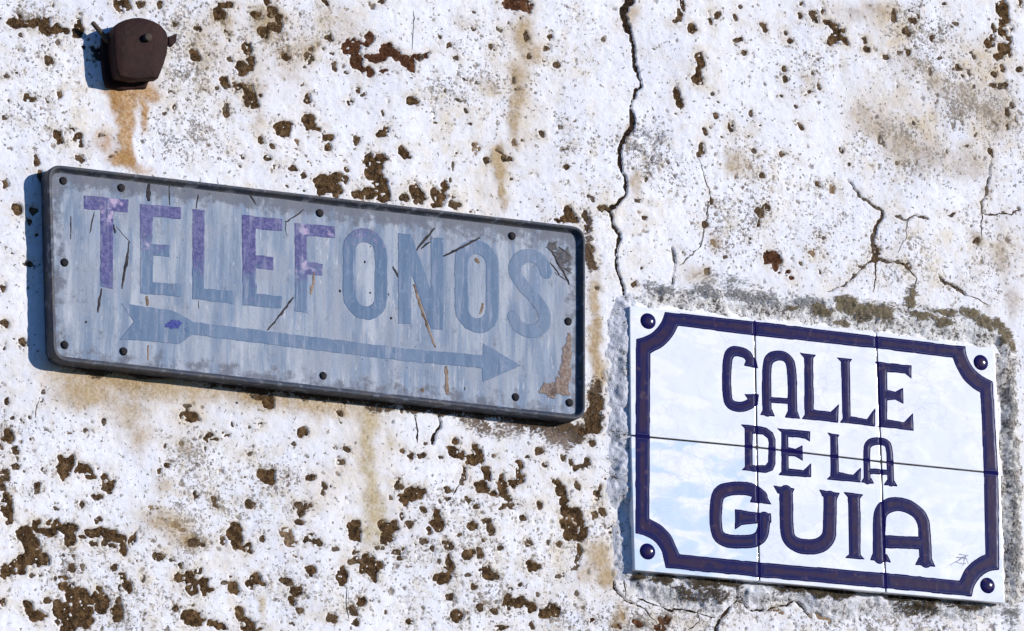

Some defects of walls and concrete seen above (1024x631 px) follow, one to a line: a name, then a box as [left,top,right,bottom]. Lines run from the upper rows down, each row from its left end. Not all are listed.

rust [102,86,158,167]
flaking render [303,31,429,106]
flaking render [258,84,478,213]
crack [608,0,642,299]
crack [827,181,990,306]
flaking render [953,0,1023,130]
crack [976,166,1020,249]
flaking render [0,319,27,350]
flaking render [0,397,146,631]
flaking render [152,376,612,631]
flaking render [611,612,672,631]